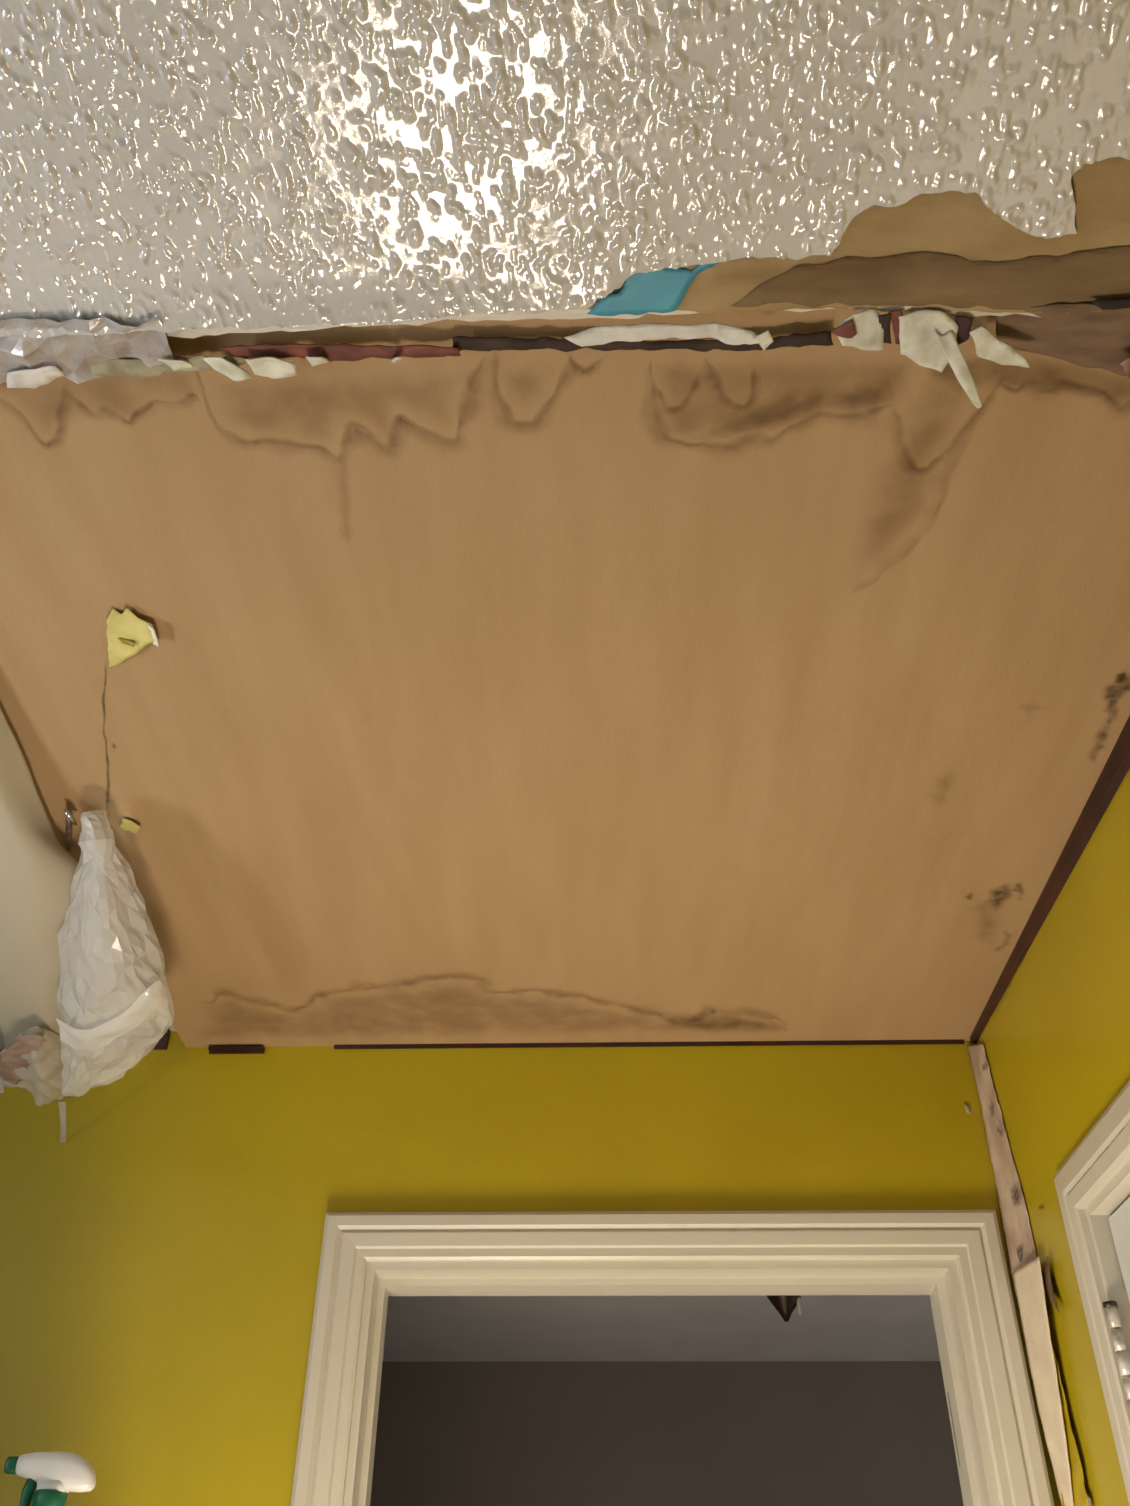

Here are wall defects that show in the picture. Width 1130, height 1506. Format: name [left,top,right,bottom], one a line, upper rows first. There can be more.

peeling [587,157,1130,316]
peeling [756,330,773,351]
peeling [7,365,64,389]
peeling [1041,1256,1060,1314]